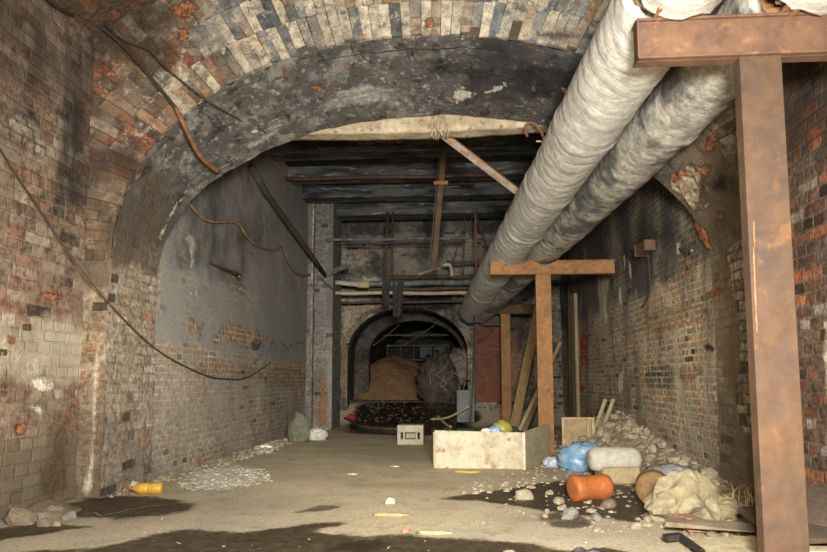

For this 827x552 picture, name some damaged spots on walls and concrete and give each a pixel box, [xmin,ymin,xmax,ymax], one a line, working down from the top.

peeling [212,324,267,348]